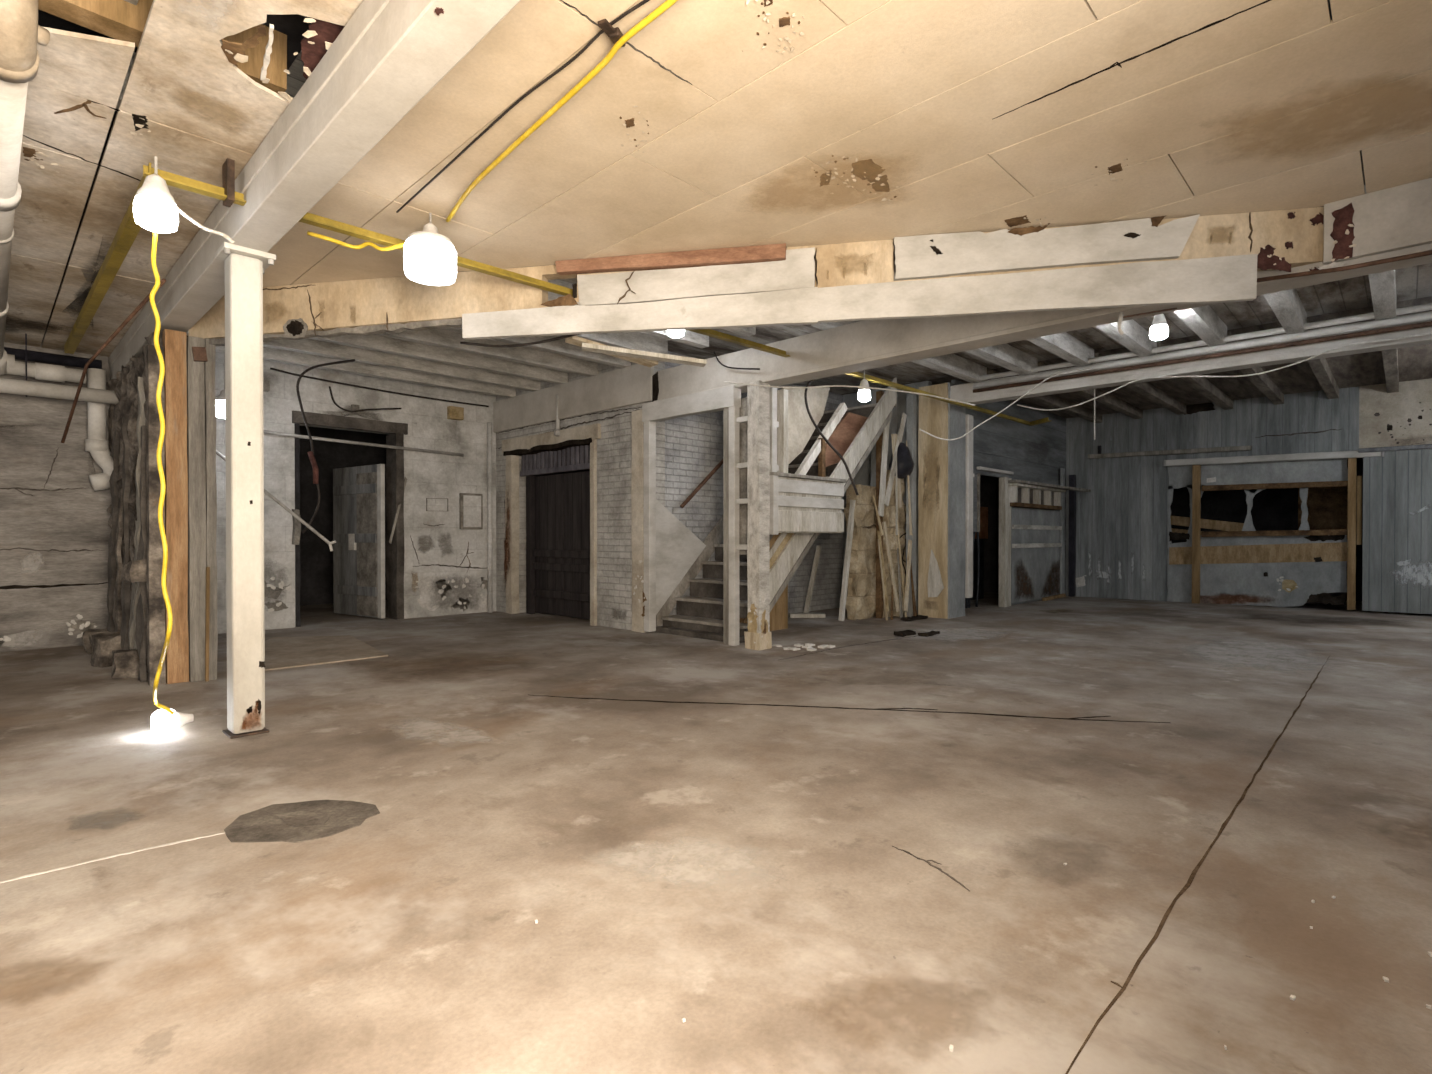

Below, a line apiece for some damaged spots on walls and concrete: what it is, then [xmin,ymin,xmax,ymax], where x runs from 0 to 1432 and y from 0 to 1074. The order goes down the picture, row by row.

spalling [221,18,345,104]
crack [617,270,636,304]
rust [242,703,261,729]
crack [532,695,1170,723]
crack [892,846,970,892]
crack [1065,656,1330,1074]